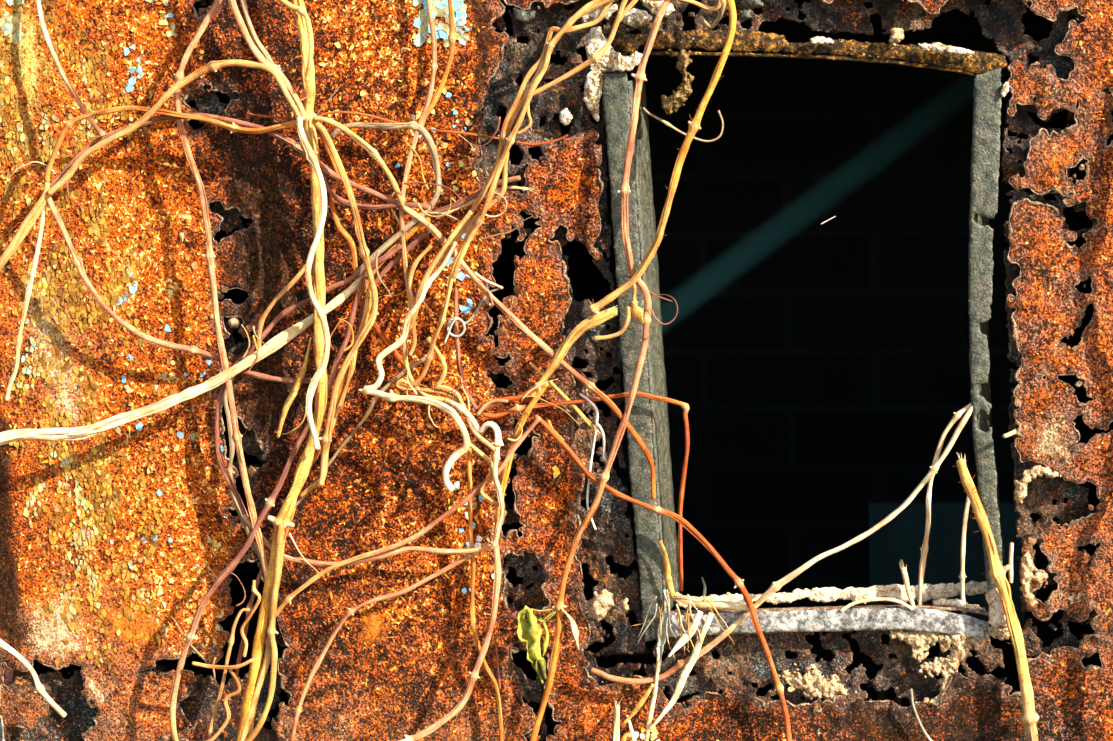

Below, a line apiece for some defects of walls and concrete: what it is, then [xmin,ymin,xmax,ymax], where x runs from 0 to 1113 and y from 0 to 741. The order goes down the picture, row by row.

peeling [314,0,485,122]
rust [468,0,496,94]
rust [24,277,80,423]
rust [215,129,307,437]
peeling [377,283,486,398]
rust [1034,414,1075,468]
rust [0,401,84,661]
peeling [326,431,490,577]
rust [360,609,387,642]
peeling [362,569,450,648]
peeling [438,566,501,648]
rust [87,678,104,720]